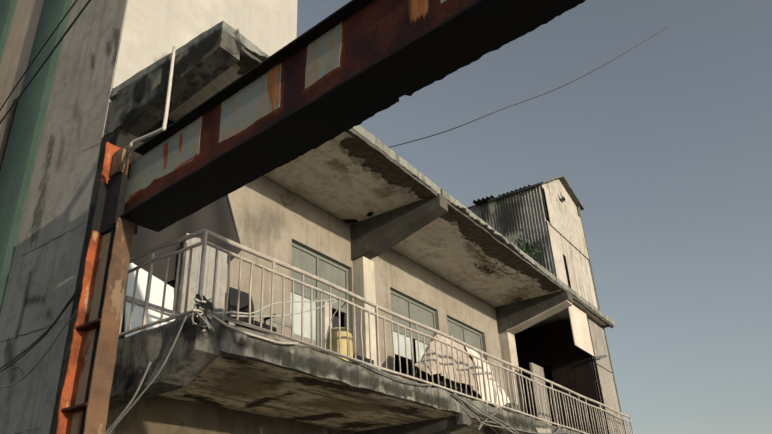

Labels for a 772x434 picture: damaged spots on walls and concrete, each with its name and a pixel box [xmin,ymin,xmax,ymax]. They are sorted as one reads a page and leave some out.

rust [410,0,440,22]
leakage [120,28,222,125]
rust [216,62,285,149]
rust [126,114,204,204]
spalling [340,137,432,201]
leakage [31,184,46,241]
leakage [481,196,546,268]
leakage [180,319,203,341]
leakage [114,360,145,396]
leakage [236,332,449,409]
leakage [481,411,552,433]